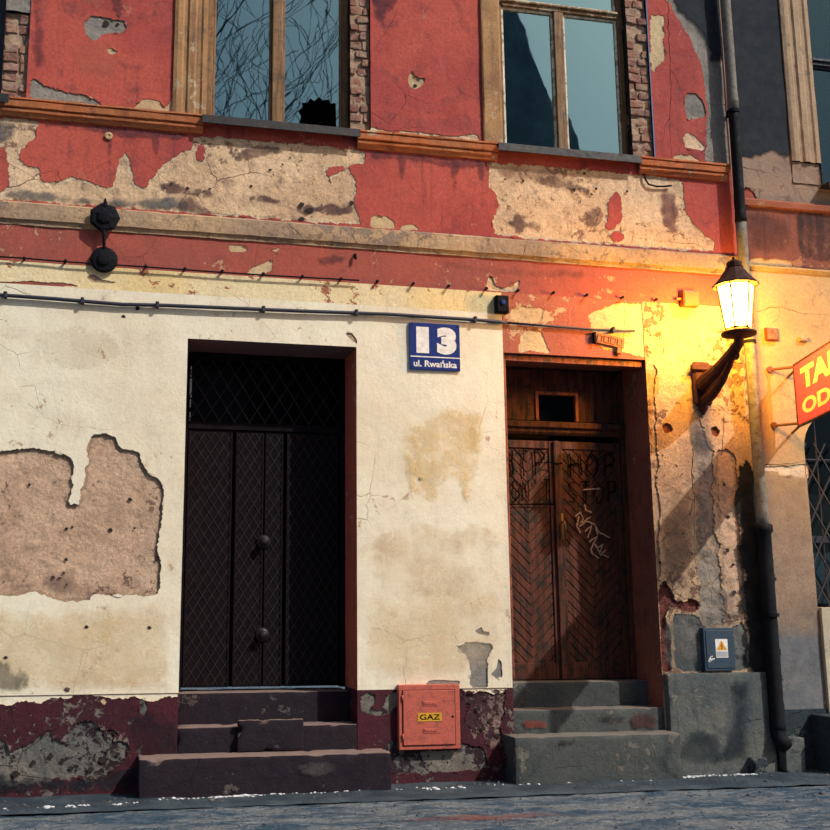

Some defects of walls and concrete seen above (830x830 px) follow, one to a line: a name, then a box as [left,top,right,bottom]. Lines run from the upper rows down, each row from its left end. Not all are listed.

crack [664,6,680,154]
peeling [666,0,731,169]
peeling [0,116,419,232]
peeling [487,162,715,252]
peeling [588,302,645,357]
spalling [0,433,165,602]
flaking render [652,365,701,672]
spalling [715,448,745,625]
leakage [0,663,28,690]
spalling [0,687,73,706]
peeling [0,720,132,784]
peeling [384,627,508,774]